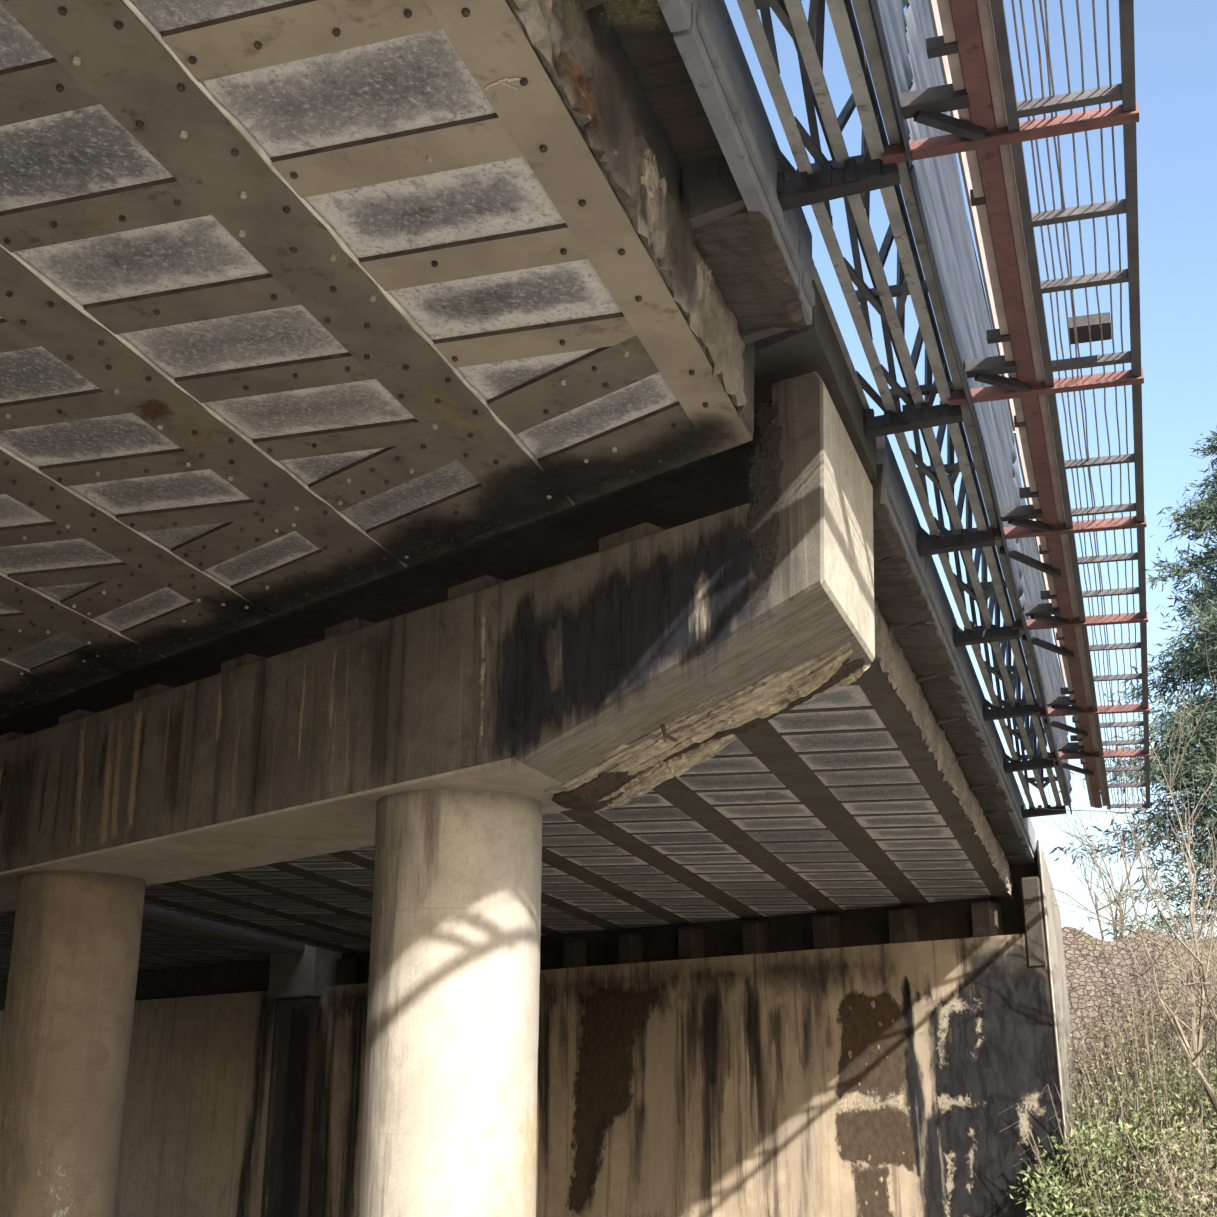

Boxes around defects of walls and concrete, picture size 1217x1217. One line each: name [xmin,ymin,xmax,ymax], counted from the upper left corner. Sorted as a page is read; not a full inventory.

rust [137,400,171,420]
damp [0,419,728,716]
damp [479,399,785,759]
damp [425,797,440,856]
spalling [543,641,871,812]
damp [537,986,555,1138]
damp [566,955,885,1217]
damp [837,944,1066,1217]